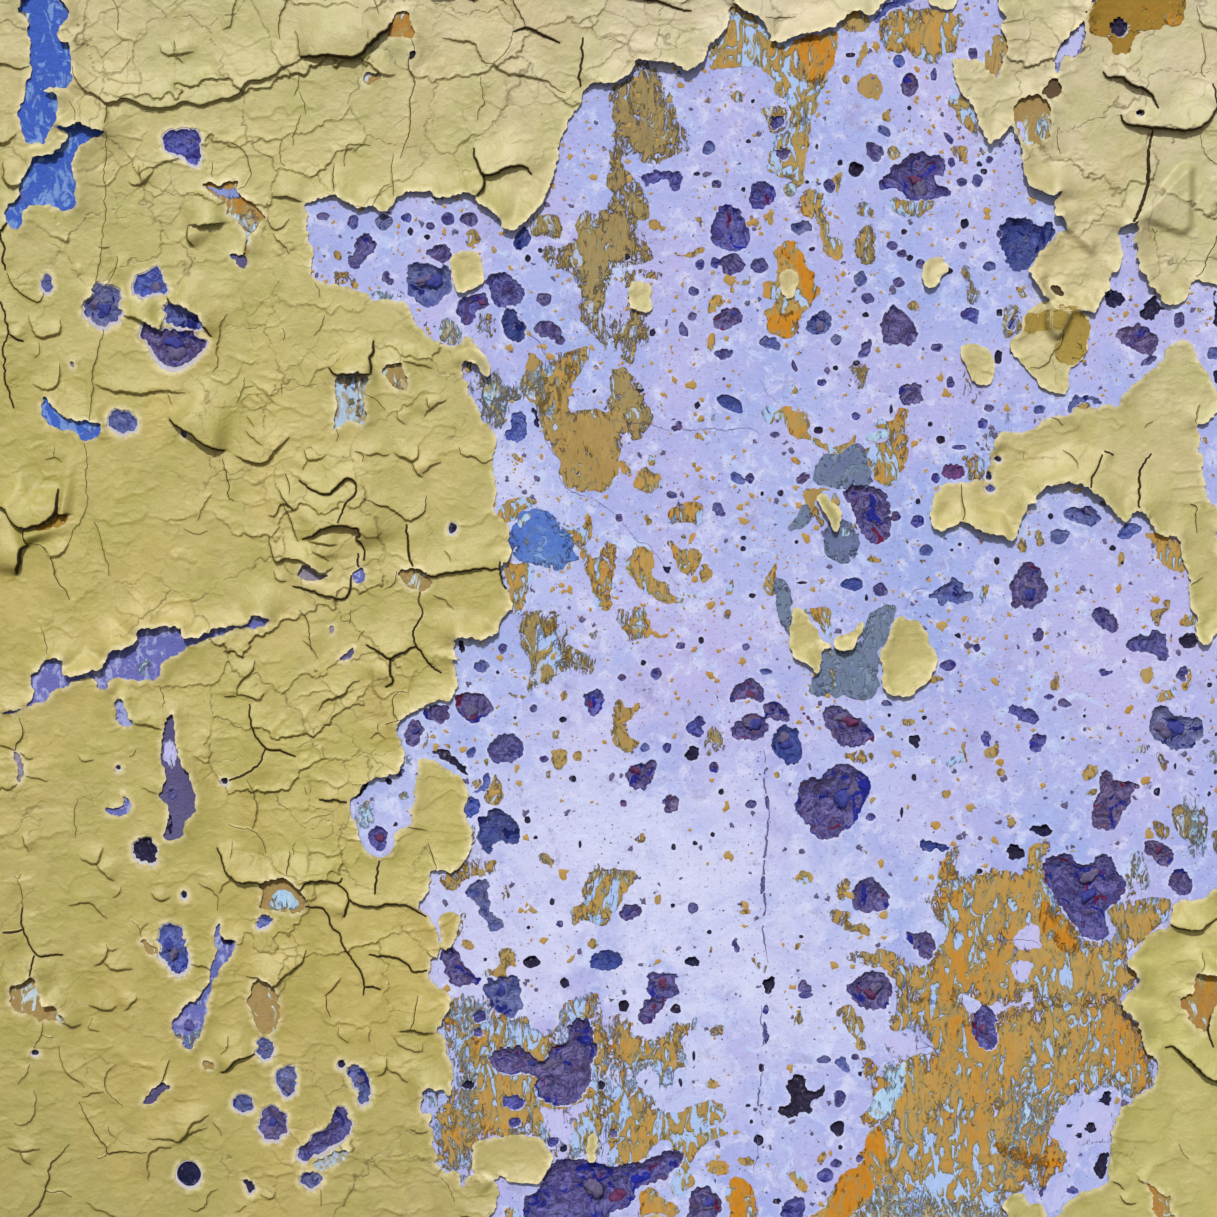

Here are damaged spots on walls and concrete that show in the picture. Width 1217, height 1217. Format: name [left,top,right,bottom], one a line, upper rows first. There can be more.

crack [0,222,61,409]
peeling [0,0,123,246]
spalling [161,127,204,169]
peeling [187,164,283,286]
crack [69,0,416,285]
crack [0,298,507,739]
peeling [281,0,1217,1217]
peeling [0,599,287,866]
crack [2,836,63,977]
crack [198,661,436,1083]
crack [7,998,222,1217]
spalling [175,1160,203,1190]